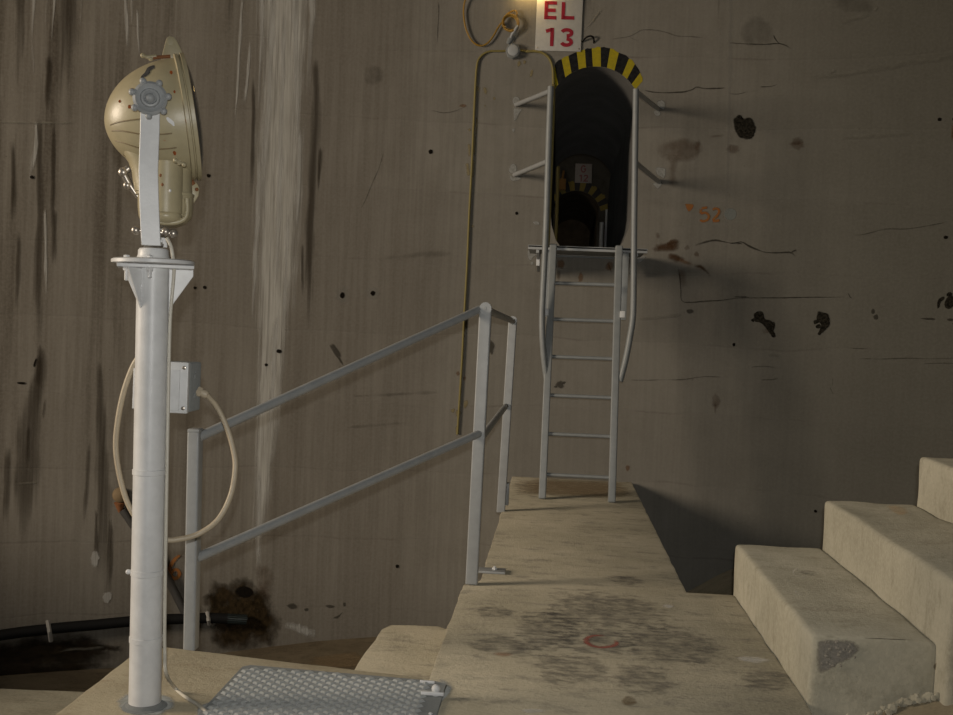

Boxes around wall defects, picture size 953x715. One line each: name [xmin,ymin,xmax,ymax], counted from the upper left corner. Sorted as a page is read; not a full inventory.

corrosion [658,240,680,261]
crack [703,240,795,253]
water stain [236,0,321,549]
crack [679,275,819,303]
water stain [206,581,275,647]
spalling [818,640,857,671]